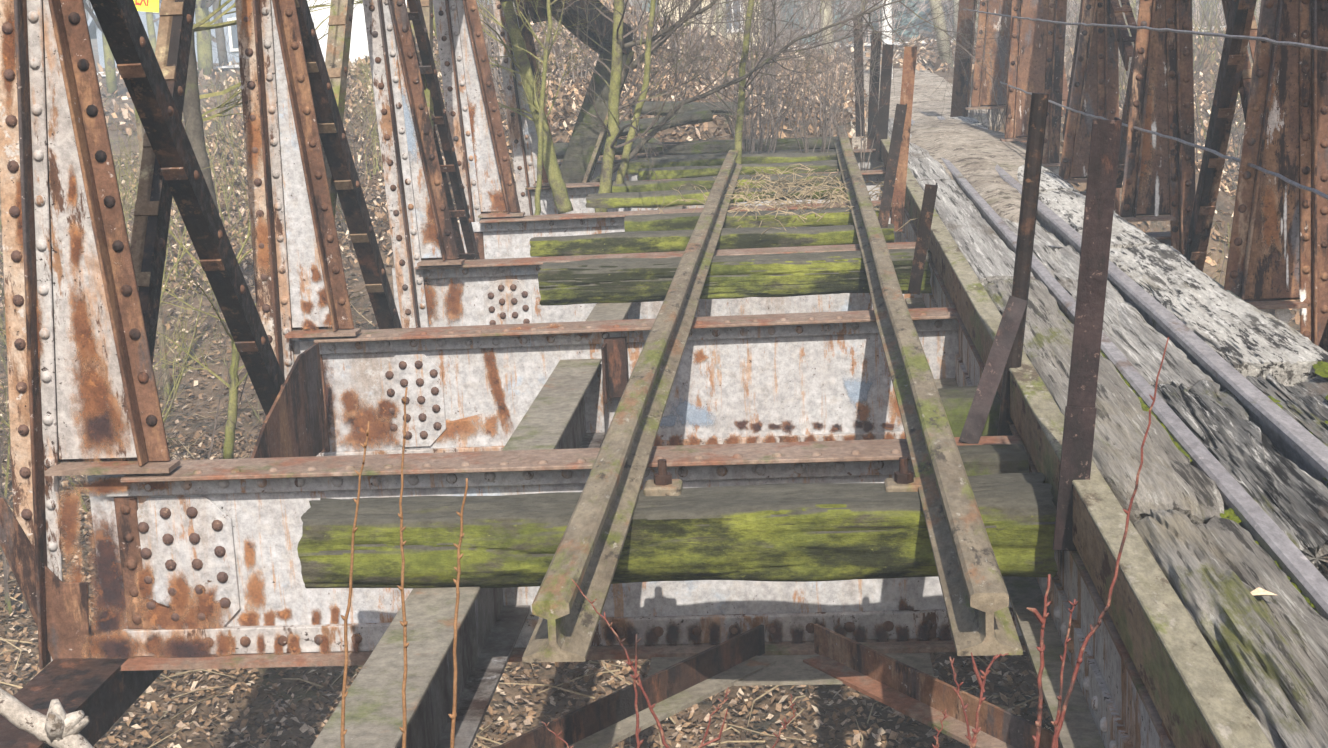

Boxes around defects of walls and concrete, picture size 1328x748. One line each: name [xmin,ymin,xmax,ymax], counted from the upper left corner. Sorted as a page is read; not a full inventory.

corrosion [68,169,77,207]
corrosion [1261,178,1282,254]
corrosion [68,223,84,271]
corrosion [69,287,127,459]
corrosion [323,362,400,449]
corrosion [436,348,512,442]
corrosion [694,349,709,364]
corrosion [654,396,906,446]
corrosion [57,477,301,659]
corrosion [311,605,340,654]
corrosion [604,599,952,647]